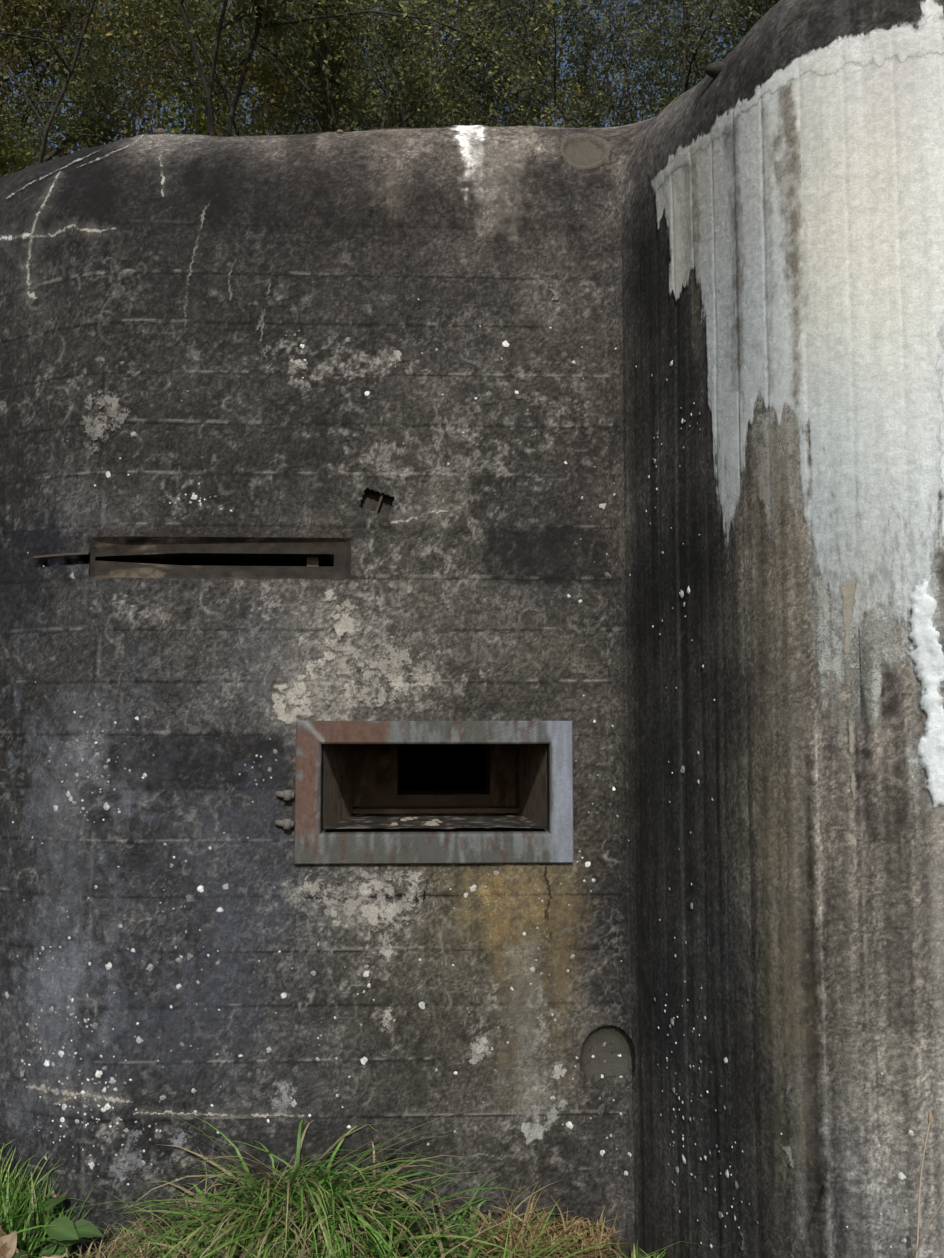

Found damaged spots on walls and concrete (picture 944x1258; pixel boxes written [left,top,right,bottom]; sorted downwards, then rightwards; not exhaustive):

crack [0,134,165,300]
crack [183,203,209,333]
crack [228,260,236,301]
crack [256,280,272,361]
water stain [452,125,521,239]
water stain [652,0,944,828]